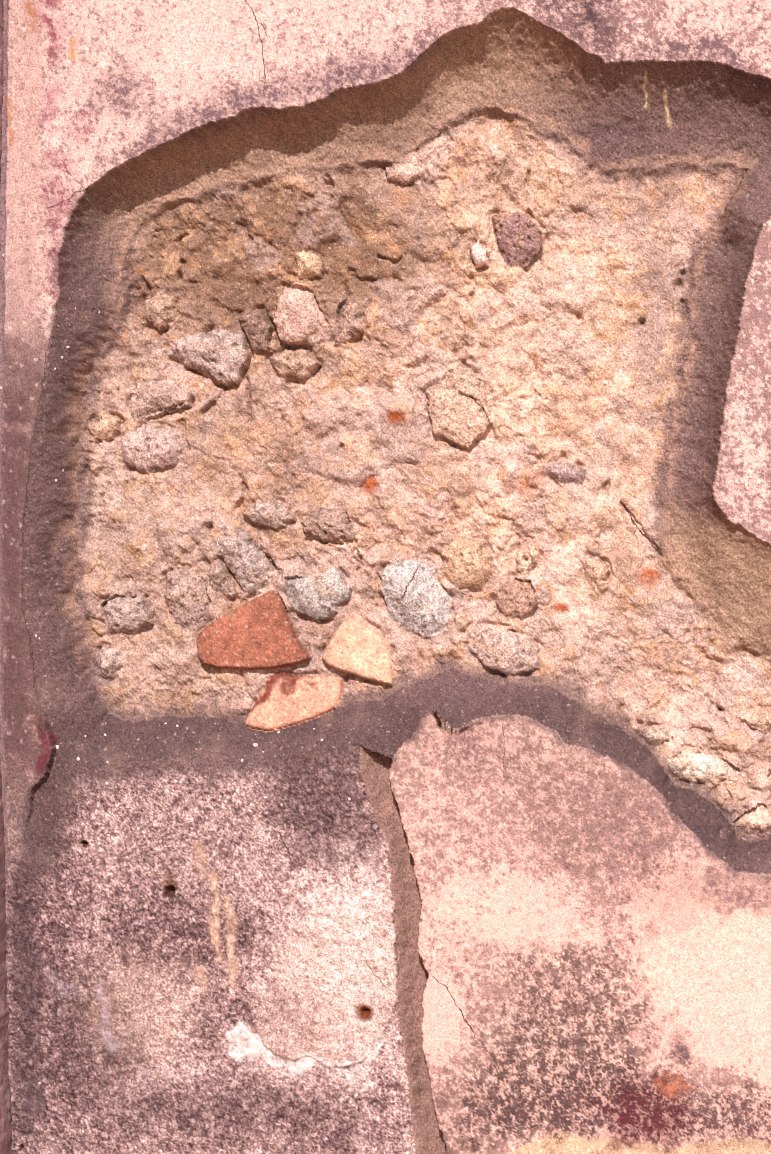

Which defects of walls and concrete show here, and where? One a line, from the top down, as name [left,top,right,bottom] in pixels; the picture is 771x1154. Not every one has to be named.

crack [245,0,268,92]
spalling [21,8,771,875]